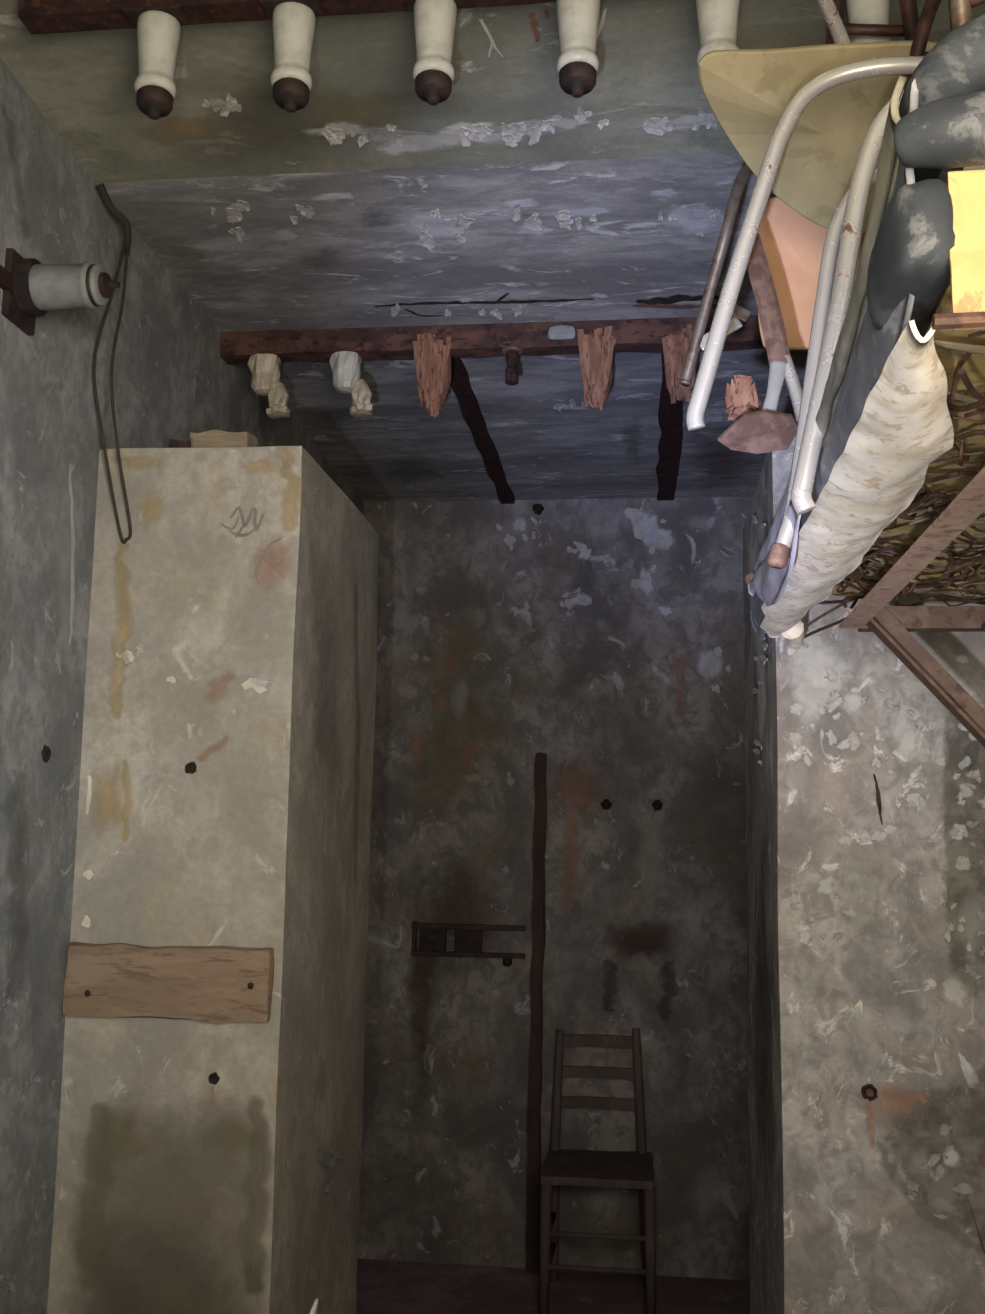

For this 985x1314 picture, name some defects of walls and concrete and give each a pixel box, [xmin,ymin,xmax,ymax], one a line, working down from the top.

peeling [308,107,609,155]
peeling [210,200,250,243]
peeling [266,204,315,241]
peeling [405,209,475,250]
peeling [502,198,610,235]
peeling [789,624,926,775]
spalling [935,718,985,1009]
leakage [83,1099,269,1314]